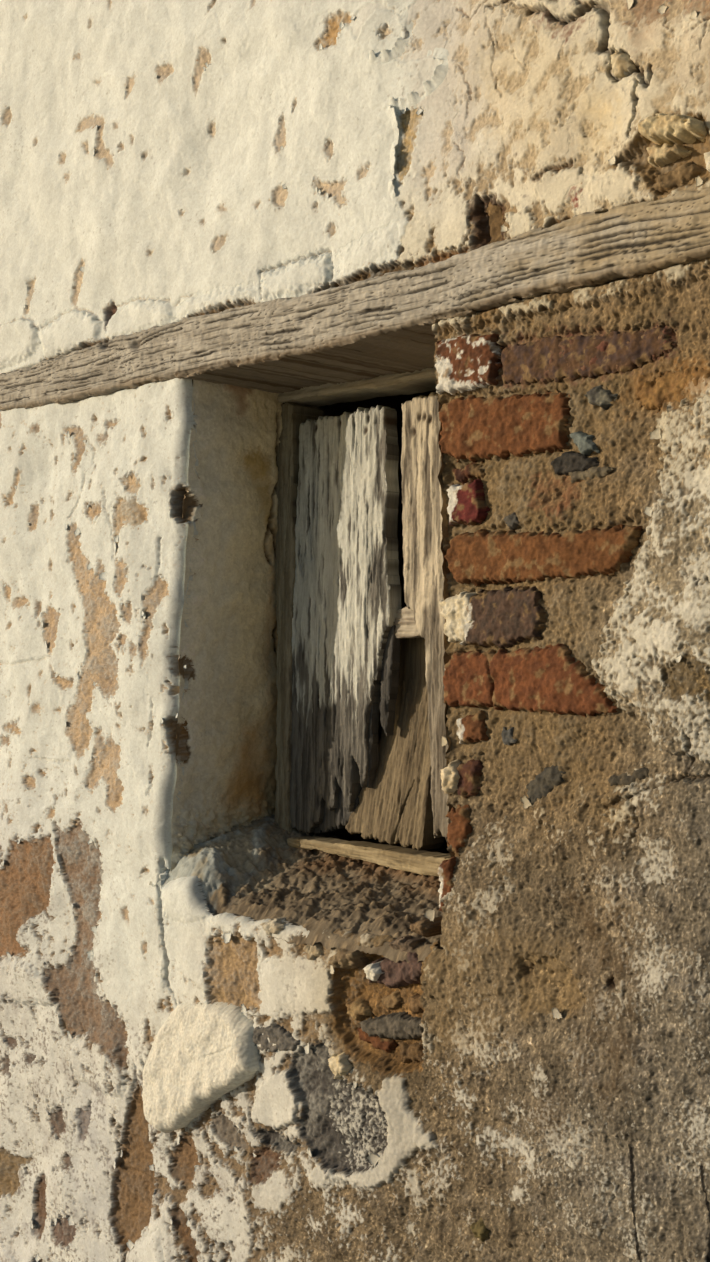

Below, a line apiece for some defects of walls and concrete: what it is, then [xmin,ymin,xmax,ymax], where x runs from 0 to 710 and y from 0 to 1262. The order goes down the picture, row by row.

peeling [385,48,449,199]
crack [452,0,654,181]
spalling [305,244,472,294]
peeling [0,467,172,814]
spalling [432,263,710,882]
peeling [160,710,193,766]
crack [600,732,710,846]
peeling [0,804,128,1055]
peeling [201,930,263,1016]
spalling [209,936,438,1191]
peeling [0,1146,81,1262]
peeling [108,1086,204,1262]